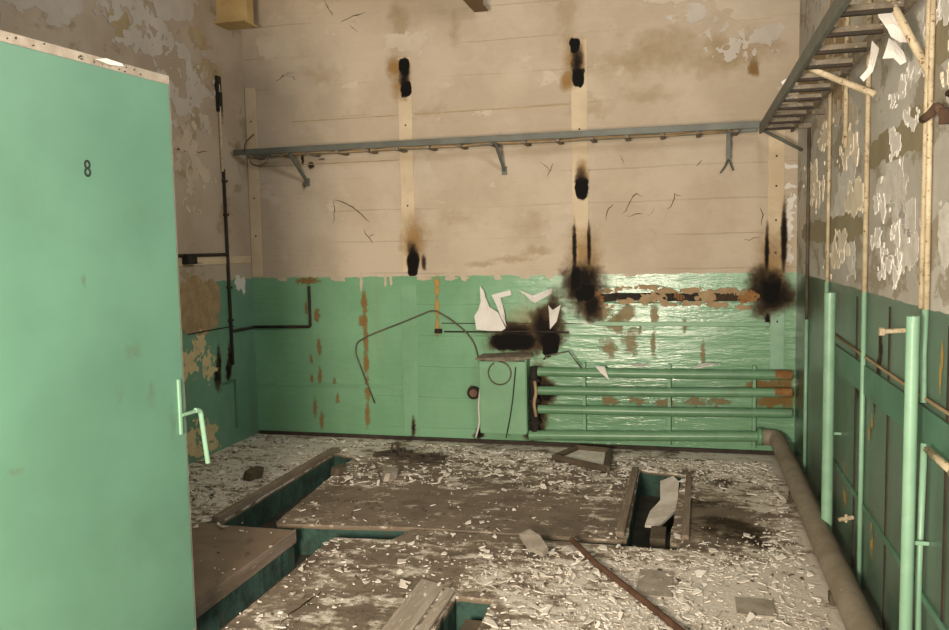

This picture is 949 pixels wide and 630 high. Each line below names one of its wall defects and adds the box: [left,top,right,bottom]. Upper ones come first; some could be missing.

peeling [665,2,785,62]
peeling [3,0,222,219]
peeling [781,0,949,290]
peeling [600,284,753,311]
corrosion [310,340,339,402]
corrosion [359,292,370,425]
peeling [187,415,221,458]